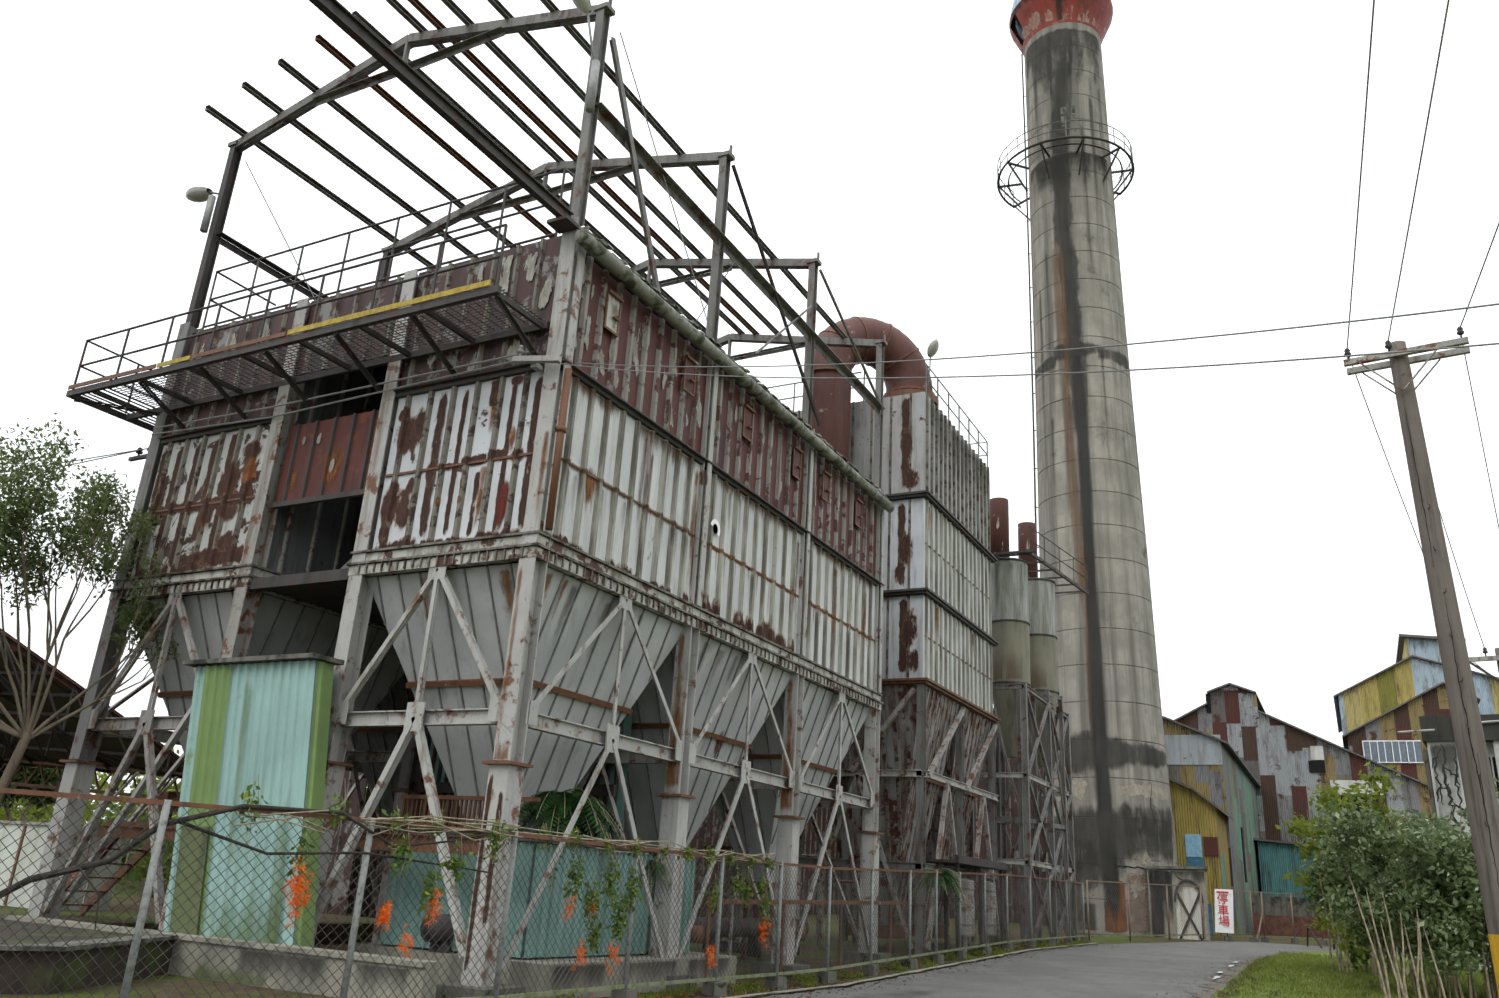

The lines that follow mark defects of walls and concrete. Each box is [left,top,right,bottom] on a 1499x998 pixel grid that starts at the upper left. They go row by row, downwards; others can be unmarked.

rust [435,467,509,528]
rust [563,426,872,639]
water stain [1026,0,1204,937]